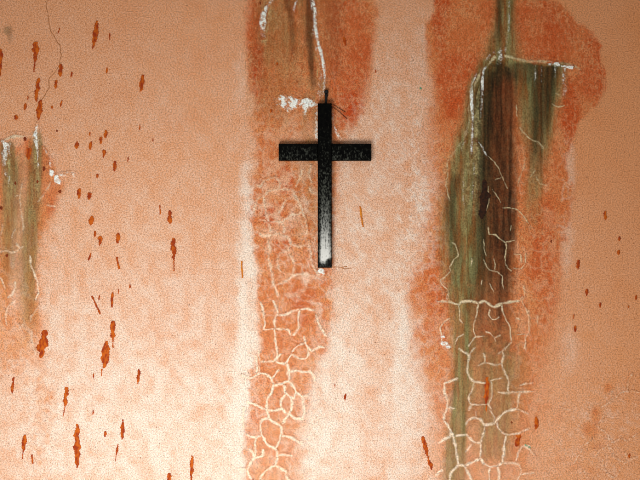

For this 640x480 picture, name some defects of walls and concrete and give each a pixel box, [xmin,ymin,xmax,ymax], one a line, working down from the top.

damp [0,138,14,210]
rust [0,127,70,480]
damp [29,121,76,215]
damp [256,0,275,50]
crack [238,164,349,480]
damp [273,0,327,144]
damp [332,108,343,144]
damp [458,0,511,219]
crack [435,156,547,480]
rust [397,0,611,480]
crack [515,105,544,150]
damp [533,61,575,100]